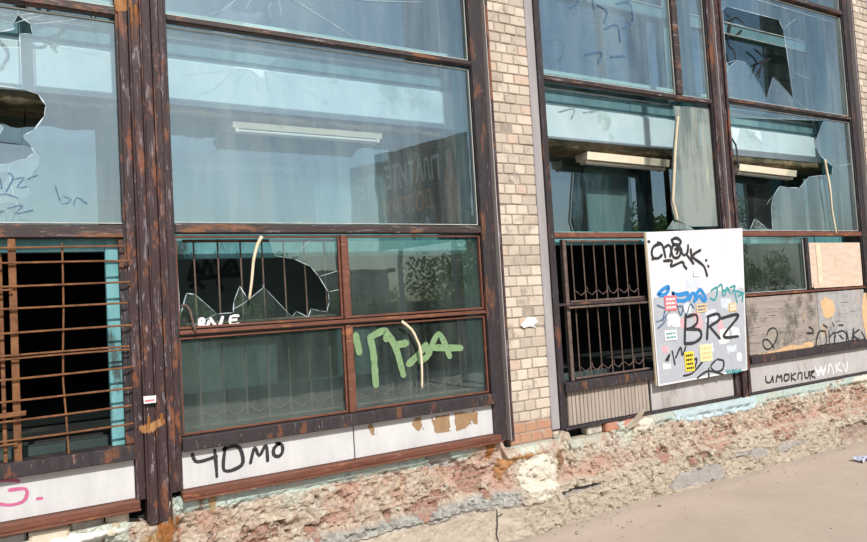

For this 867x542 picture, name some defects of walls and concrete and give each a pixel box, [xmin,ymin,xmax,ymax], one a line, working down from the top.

corrosion [139,413,165,434]
peeling [412,409,478,433]
peeling [654,396,757,467]
spalling [765,401,806,443]
spalling [820,379,867,443]
corrosion [485,444,547,480]
corrosion [142,515,180,542]
spalling [237,519,290,542]
spalling [303,514,330,542]
crack [351,508,503,542]